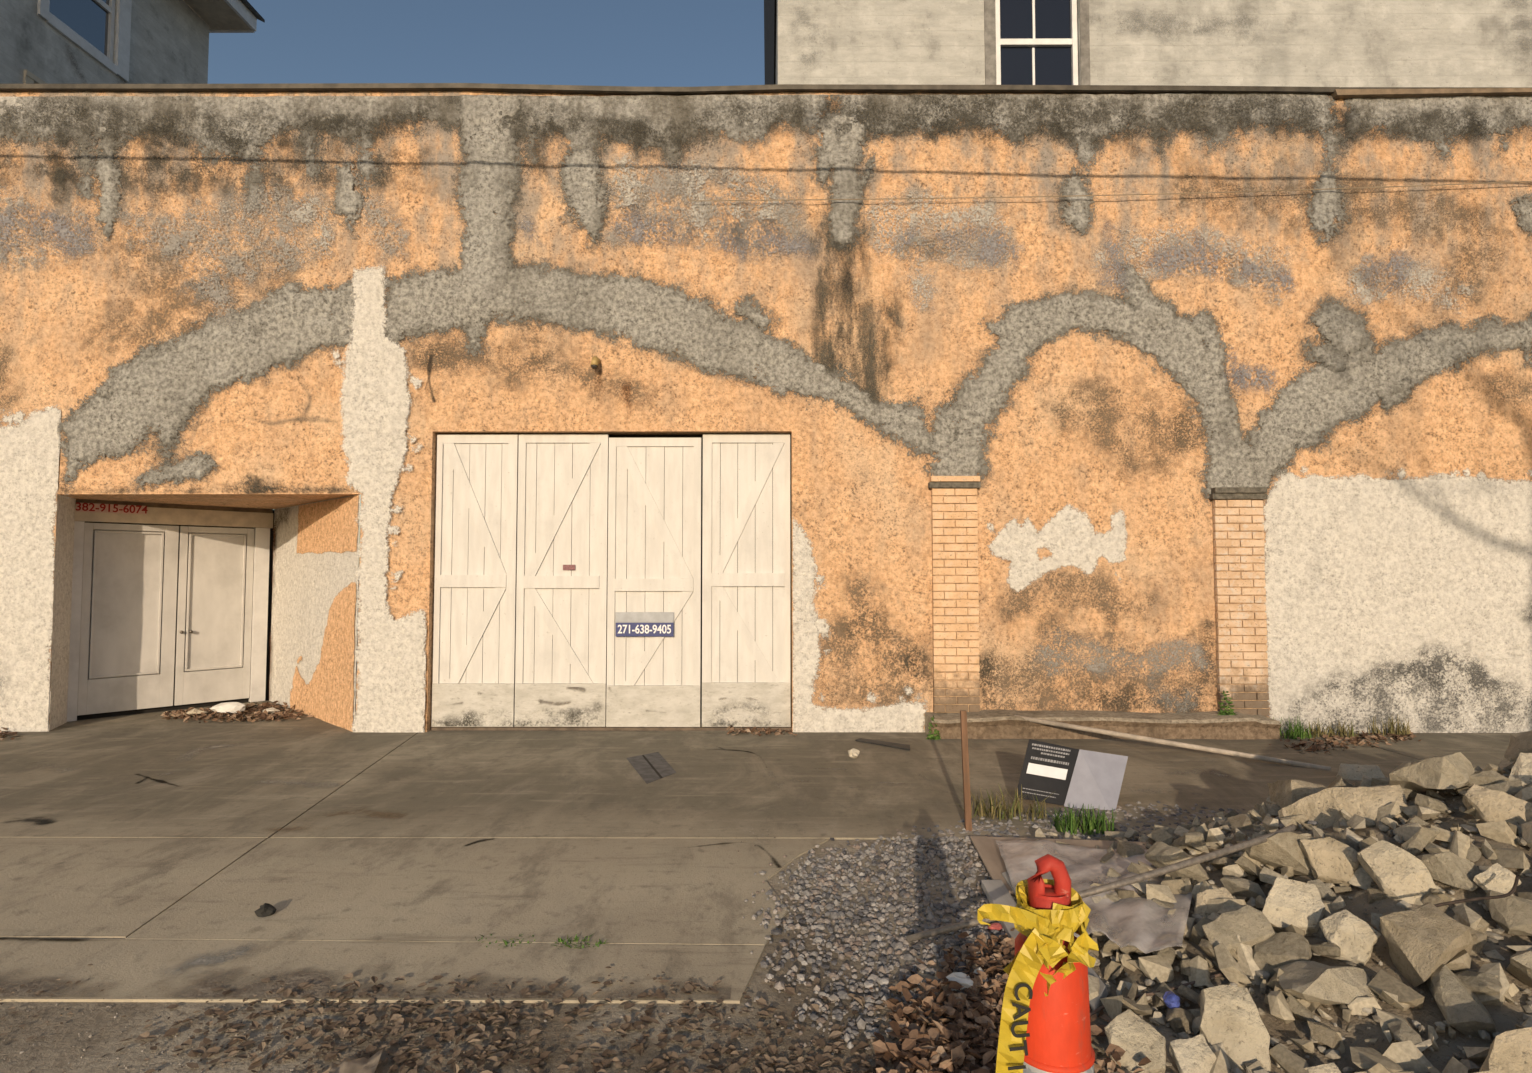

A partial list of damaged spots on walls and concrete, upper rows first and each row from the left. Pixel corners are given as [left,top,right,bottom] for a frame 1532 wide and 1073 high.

damp [0,99,435,203]
damp [680,160,777,241]
damp [499,94,1530,206]
damp [1174,174,1315,226]
damp [1336,175,1505,305]
damp [817,226,901,402]
peeling [0,93,1532,733]
damp [1284,650,1532,733]